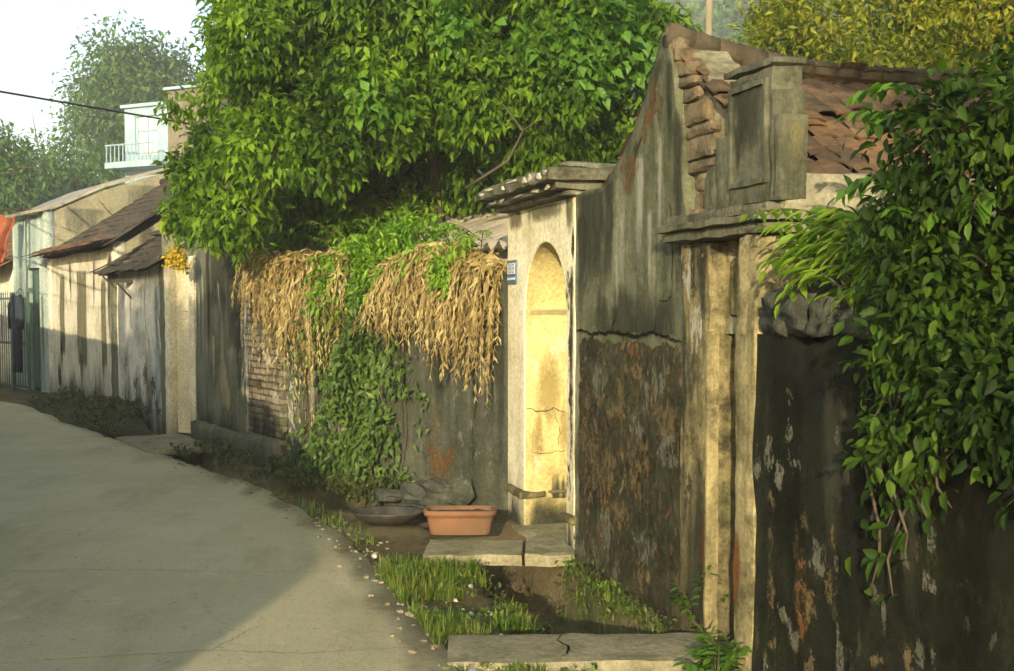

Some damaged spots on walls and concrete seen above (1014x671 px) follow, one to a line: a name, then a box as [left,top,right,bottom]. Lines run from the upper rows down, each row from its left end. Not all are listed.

leakage [637,61,681,274]
leakage [58,255,120,401]
leakage [511,181,671,403]
crack [577,244,681,342]
leakage [691,245,706,310]
spalling [547,242,705,624]
leakage [687,468,704,625]
spalling [753,417,802,509]
spalling [754,511,883,671]
spalling [867,577,887,636]
spalling [903,635,939,671]
spalling [899,466,946,596]